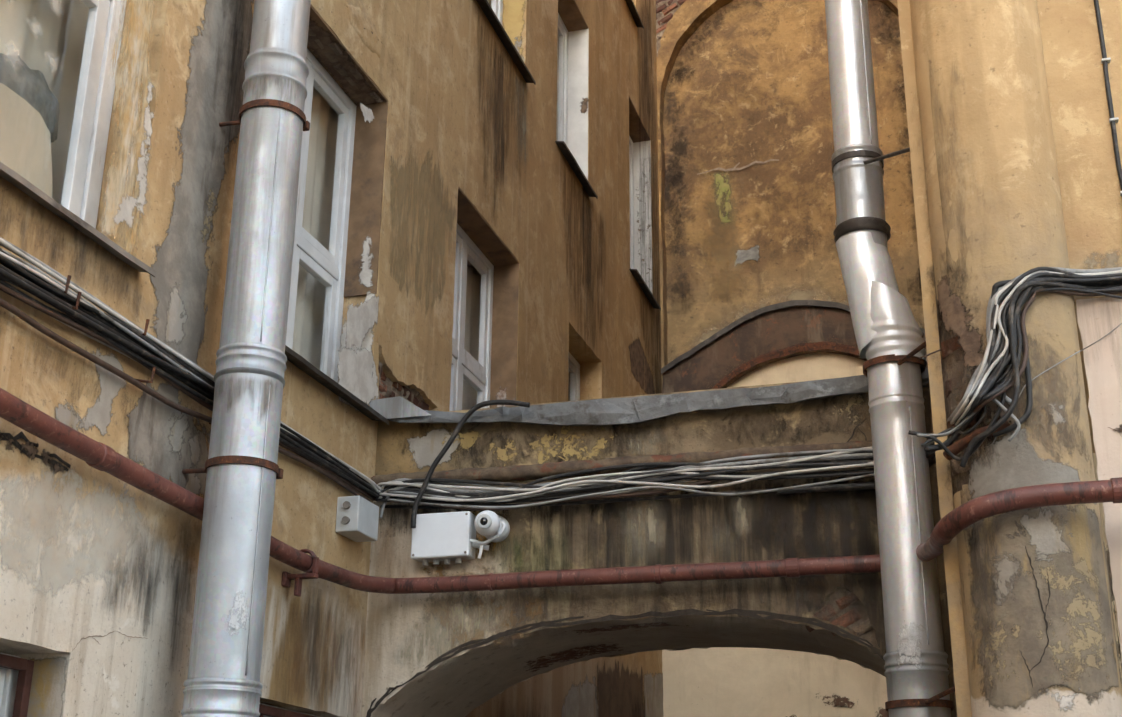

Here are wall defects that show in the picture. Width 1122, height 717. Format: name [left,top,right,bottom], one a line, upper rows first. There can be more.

peeling [150,0,254,364]
water stain [638,0,758,394]
spalling [337,236,429,411]
water stain [693,288,849,347]
water stain [908,256,963,295]
crack [0,431,71,474]
peeling [127,371,211,498]
peeling [407,425,614,469]
water stain [390,503,482,530]
water stain [533,476,878,568]
crack [1020,546,1050,687]
peeling [965,503,1122,711]